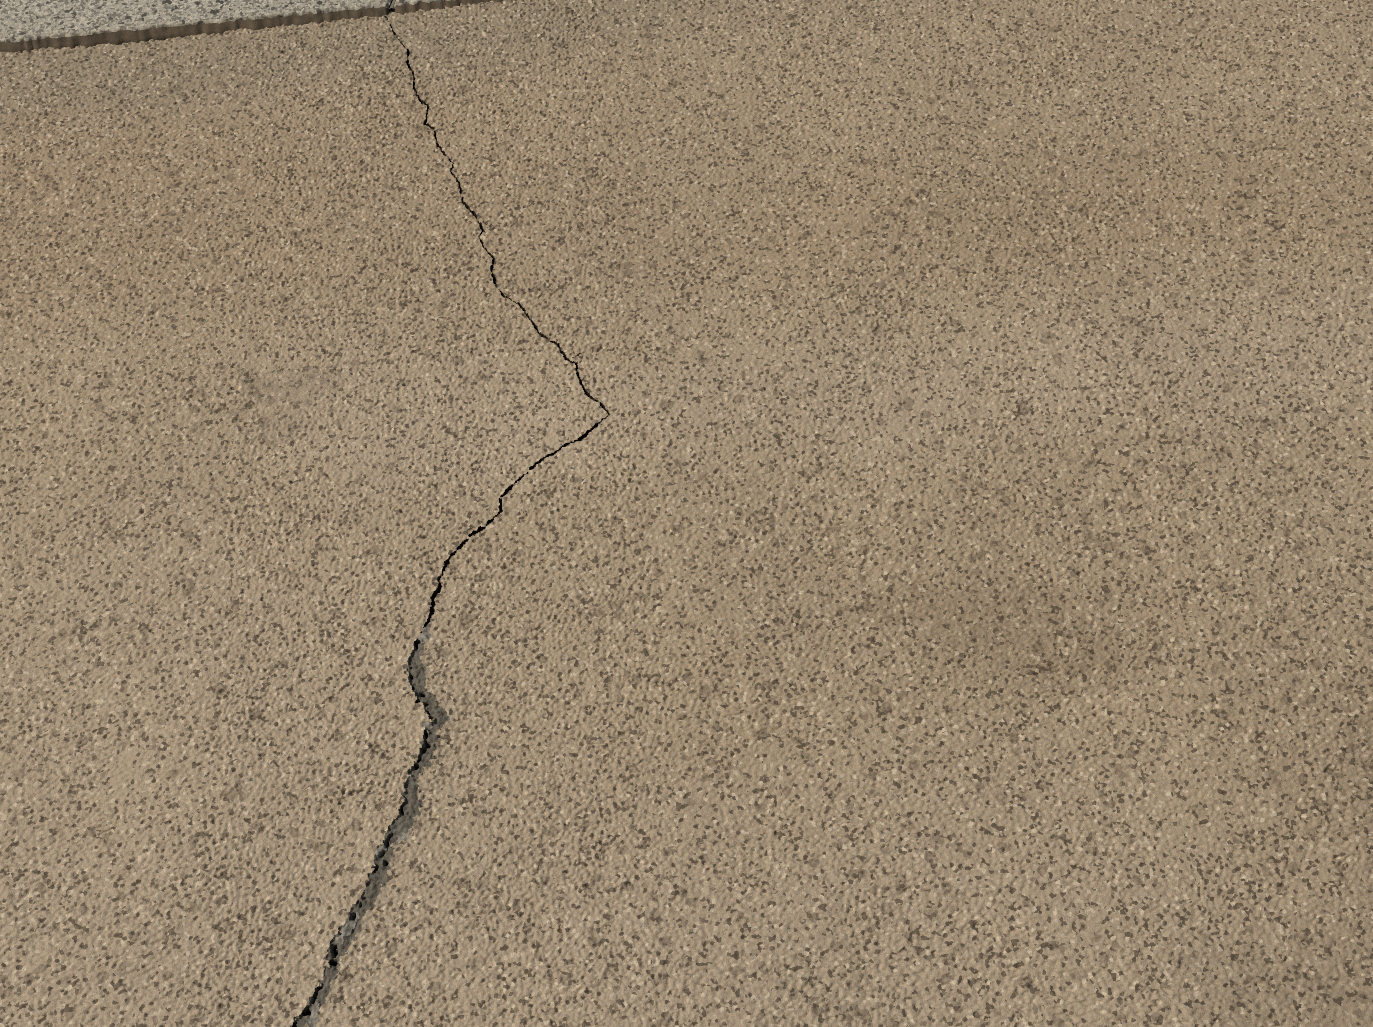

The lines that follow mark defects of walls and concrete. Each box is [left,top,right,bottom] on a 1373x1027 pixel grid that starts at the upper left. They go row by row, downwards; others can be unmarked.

crack [290,16,610,1027]